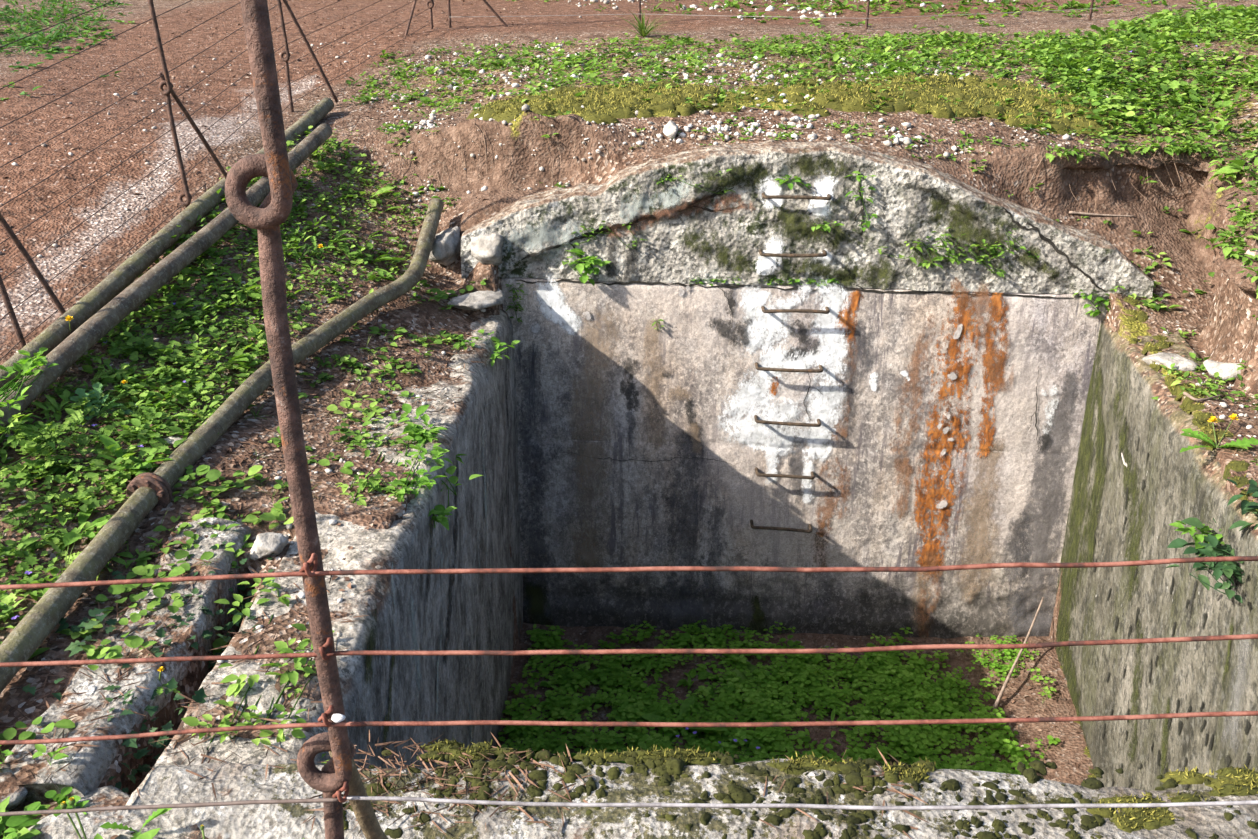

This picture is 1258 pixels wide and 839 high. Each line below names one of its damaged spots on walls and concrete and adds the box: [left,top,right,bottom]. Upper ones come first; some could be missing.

water stain [606,234,638,278]
efflorescence [758,178,783,209]
crack [516,187,1103,323]
efflorescence [808,175,836,216]
water stain [709,236,878,510]
water stain [505,310,723,630]
rust [890,279,1013,637]
water stain [436,461,459,714]
water stain [1222,617,1234,689]
water stain [1159,698,1170,791]